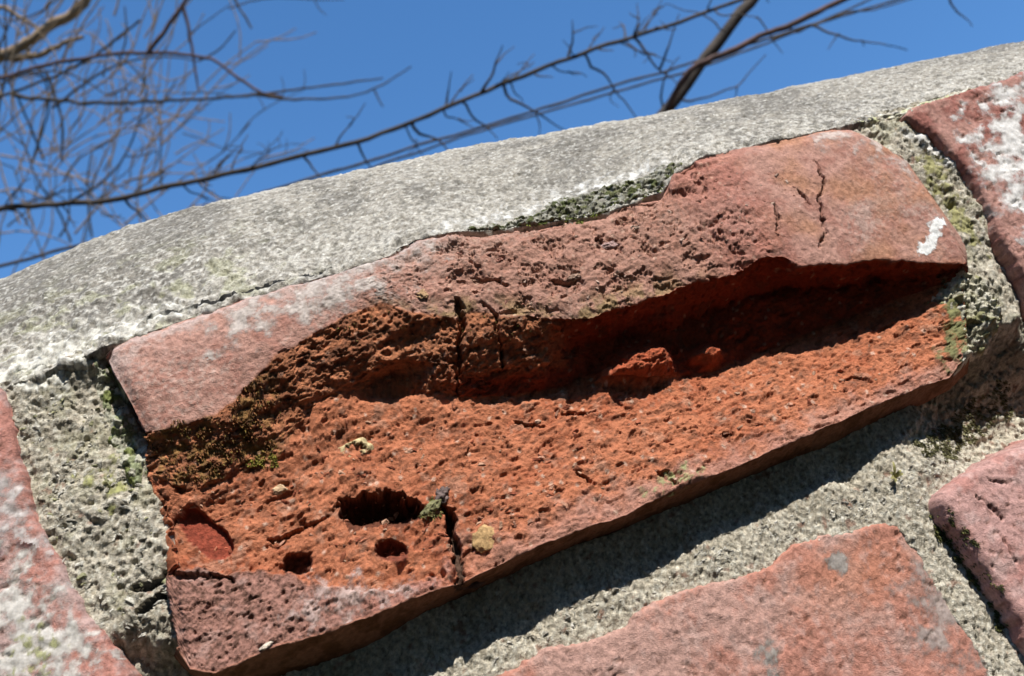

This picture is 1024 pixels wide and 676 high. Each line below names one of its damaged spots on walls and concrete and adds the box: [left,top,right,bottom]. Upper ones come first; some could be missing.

damp [956,82,1024,213]
crack [774,205,782,232]
crack [817,163,829,243]
damp [917,217,946,255]
crack [455,297,505,394]
spalling [147,256,967,595]